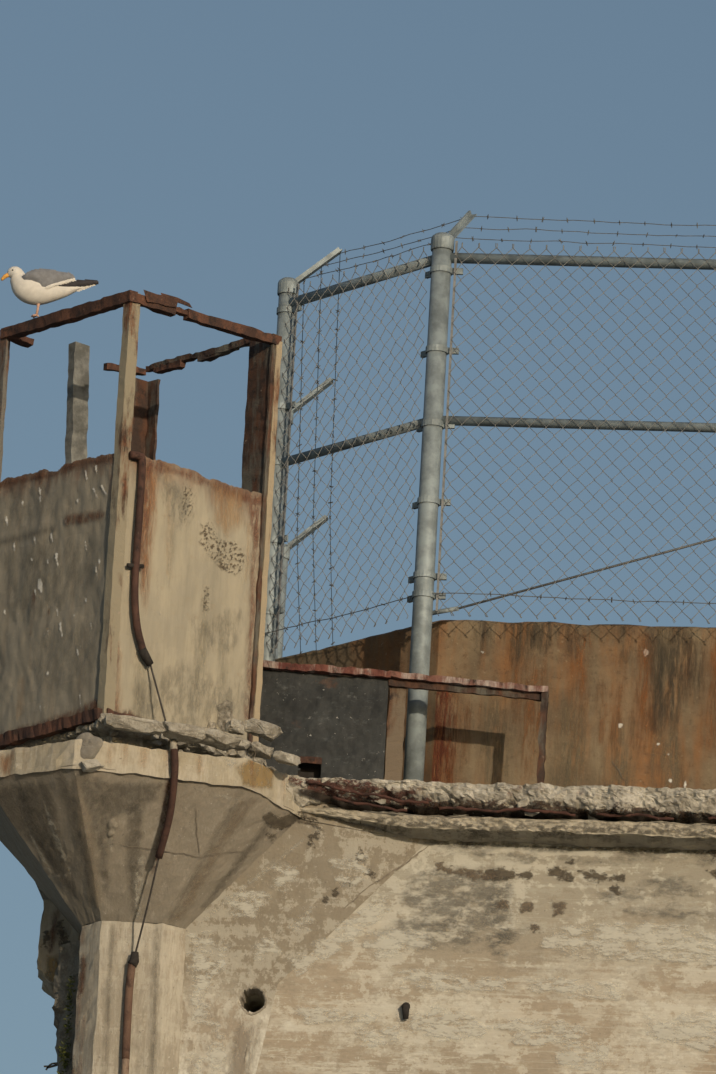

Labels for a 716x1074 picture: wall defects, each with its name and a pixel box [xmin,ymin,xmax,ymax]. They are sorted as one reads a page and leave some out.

peeling [101,700,276,771]
damp [231,1026,251,1074]